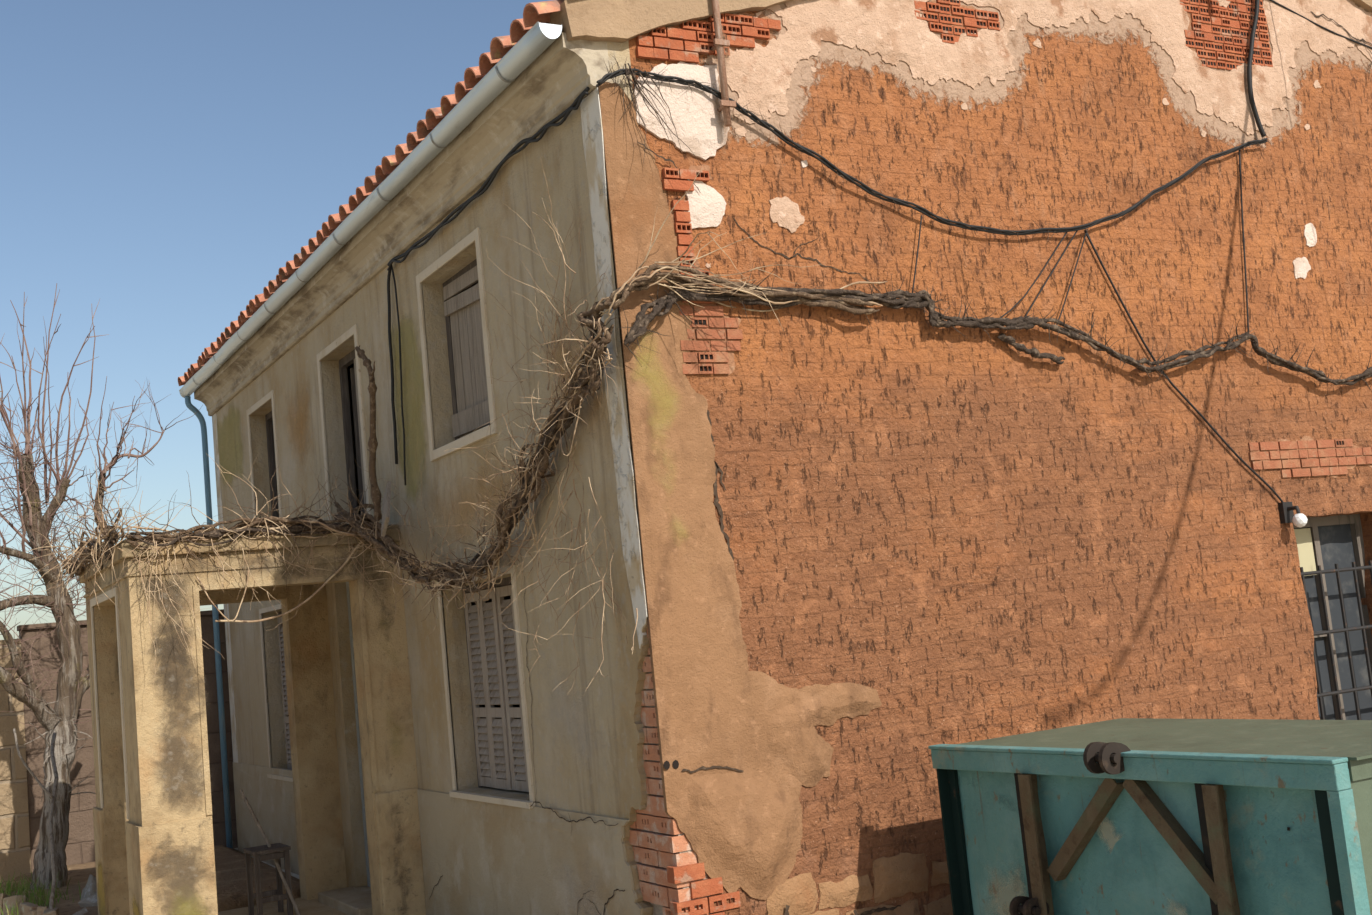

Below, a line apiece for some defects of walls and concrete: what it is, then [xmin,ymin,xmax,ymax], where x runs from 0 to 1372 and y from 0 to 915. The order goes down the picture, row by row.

flaking render [633,0,1372,375]
flaking render [1248,436,1372,478]
damp [147,579,200,802]
damp [150,848,205,915]
crack [524,576,617,832]
crack [577,889,625,915]
spalling [629,628,741,915]